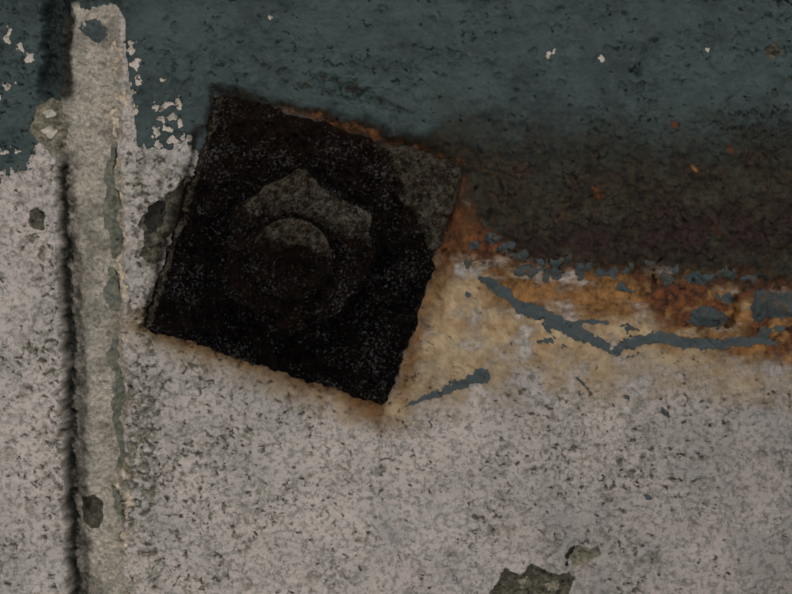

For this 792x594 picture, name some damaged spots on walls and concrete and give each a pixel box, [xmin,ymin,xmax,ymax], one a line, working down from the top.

peeling [3,25,34,63]
spalling [30,98,70,156]
peeling [151,98,185,149]
peeling [78,18,142,311]
spalling [28,207,45,230]
spalling [138,181,182,264]
rust [131,86,792,424]
peeling [461,232,636,294]
peeling [660,264,792,340]
peeling [106,329,135,554]
spalling [82,495,103,528]